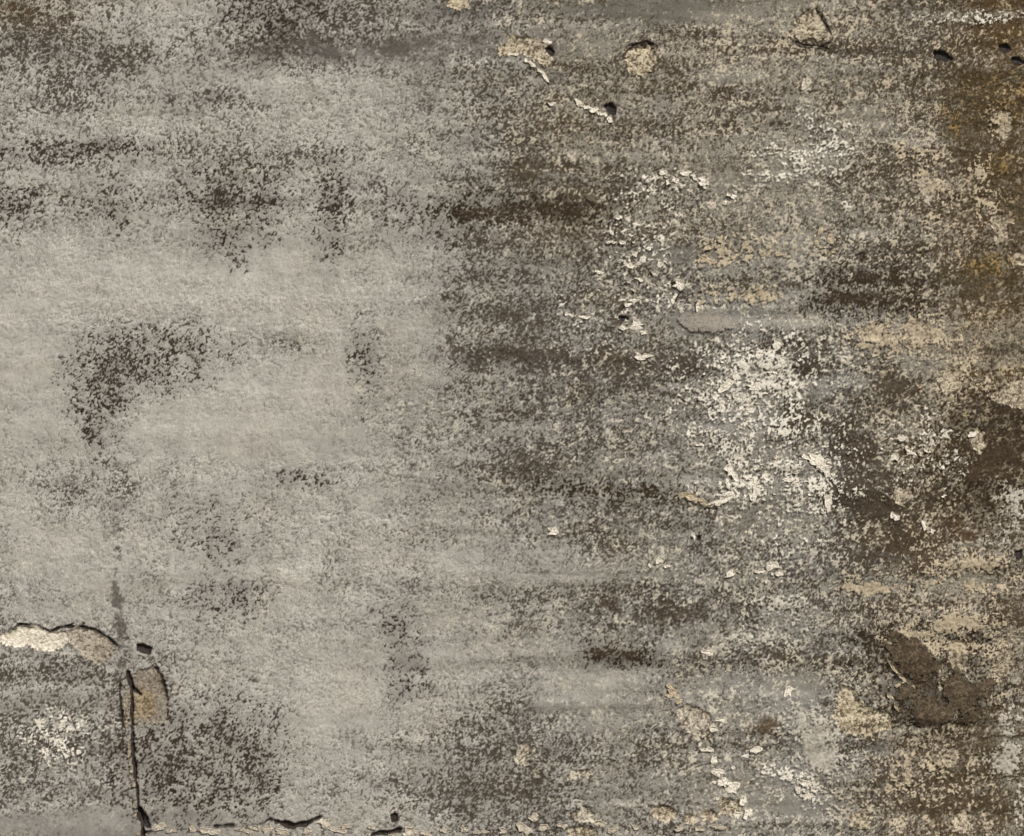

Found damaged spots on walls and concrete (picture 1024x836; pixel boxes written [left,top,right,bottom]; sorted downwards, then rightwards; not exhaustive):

spalling [784,6,834,42]
spalling [497,34,554,83]
spalling [623,44,659,78]
peeling [706,339,789,429]
peeling [678,453,835,514]
spalling [0,625,115,666]
spalling [937,637,970,692]
spalling [123,663,170,728]
crack [12,622,169,836]